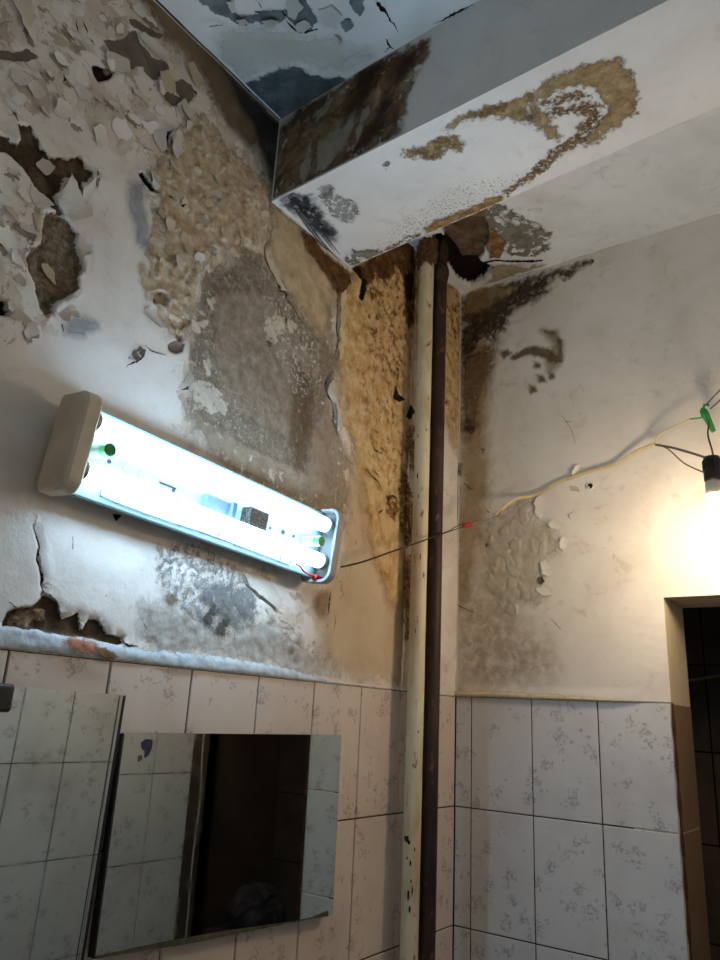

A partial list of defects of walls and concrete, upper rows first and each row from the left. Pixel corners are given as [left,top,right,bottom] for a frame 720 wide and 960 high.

peeling [0,0,364,514]
spalling [434,208,543,284]
water stain [143,0,640,681]
peeling [2,515,336,675]
peeling [485,495,582,615]